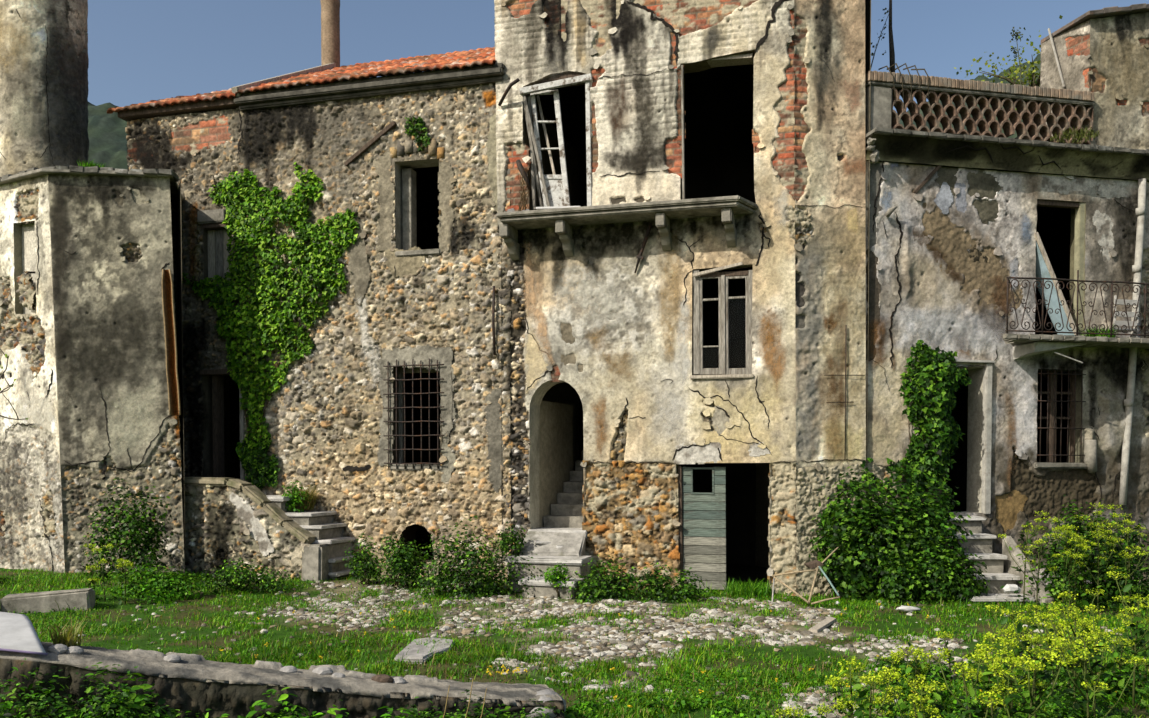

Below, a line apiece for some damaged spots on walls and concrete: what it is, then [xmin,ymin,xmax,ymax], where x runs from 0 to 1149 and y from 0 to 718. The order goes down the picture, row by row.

water stain [45,0,89,160]
water stain [539,0,569,73]
flaking render [501,0,758,179]
crack [597,1,679,79]
water stain [606,0,672,188]
flaking render [752,4,815,328]
flaking render [0,271,46,382]
crack [799,161,903,388]
flaking render [912,167,1023,316]
crack [63,389,172,525]
crack [588,378,867,464]
flaking render [995,447,1098,534]